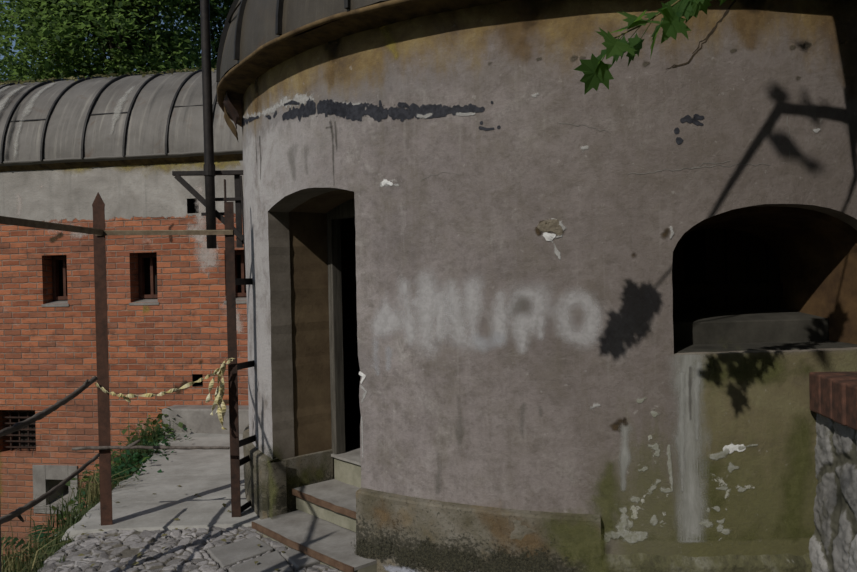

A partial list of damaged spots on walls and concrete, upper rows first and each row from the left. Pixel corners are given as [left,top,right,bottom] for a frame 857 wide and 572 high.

peeling [242,94,501,131]
leakage [189,188,215,267]
spalling [535,218,565,259]
spalling [611,418,628,432]
flaking render [603,430,673,543]
leakage [676,354,703,542]
flaking render [699,444,758,540]